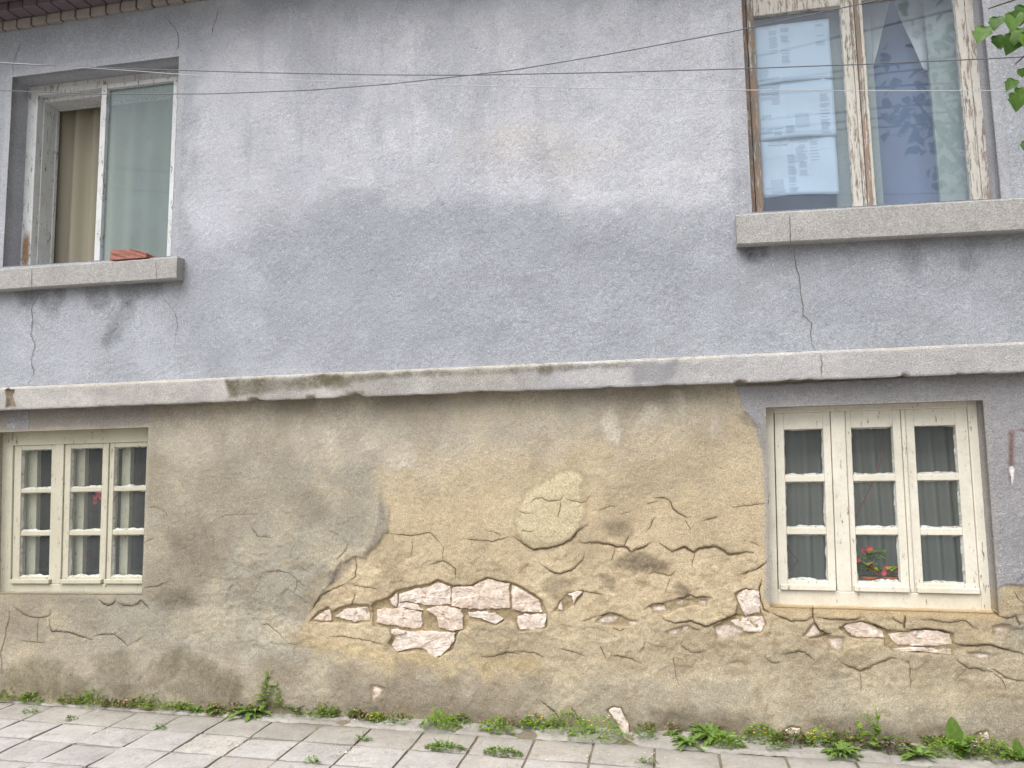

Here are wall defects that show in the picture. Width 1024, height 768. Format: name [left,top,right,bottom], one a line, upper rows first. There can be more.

damp [289,375,347,388]
crack [389,532,456,578]
crack [0,609,143,675]
crack [102,582,166,606]
spalling [311,577,583,658]
spalling [714,589,766,638]
crack [469,495,1023,692]
spalling [803,621,954,656]